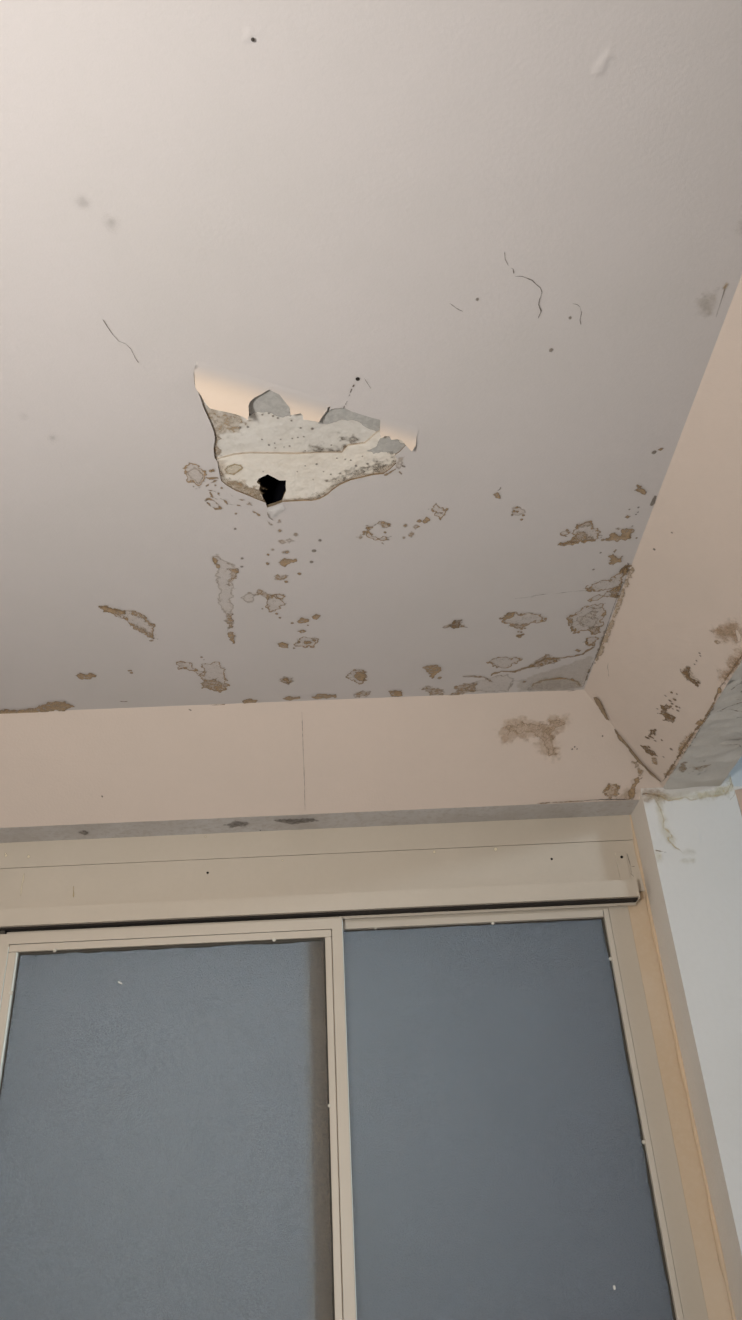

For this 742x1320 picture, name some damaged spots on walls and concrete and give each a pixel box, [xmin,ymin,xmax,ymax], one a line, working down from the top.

peeling [206,469,285,525]
peeling [583,564,634,686]
peeling [0,701,74,714]
crack [572,656,742,782]
crack [538,797,629,805]